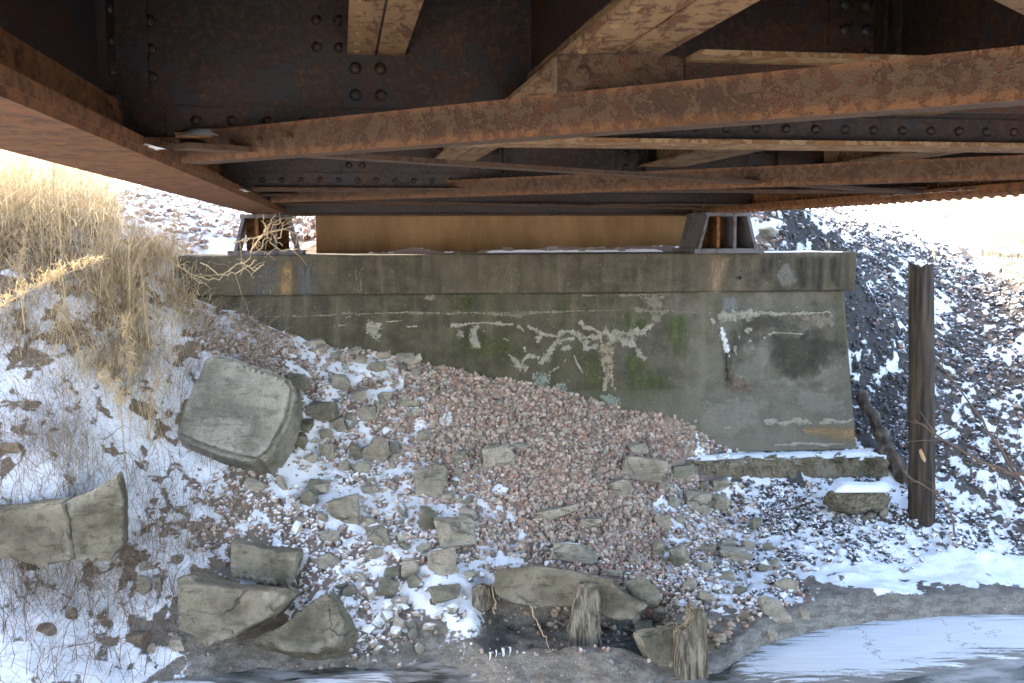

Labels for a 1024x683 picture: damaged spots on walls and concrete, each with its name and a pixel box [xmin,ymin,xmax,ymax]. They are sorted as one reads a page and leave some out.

water stain [253,292,845,377]
water stain [596,341,616,392]